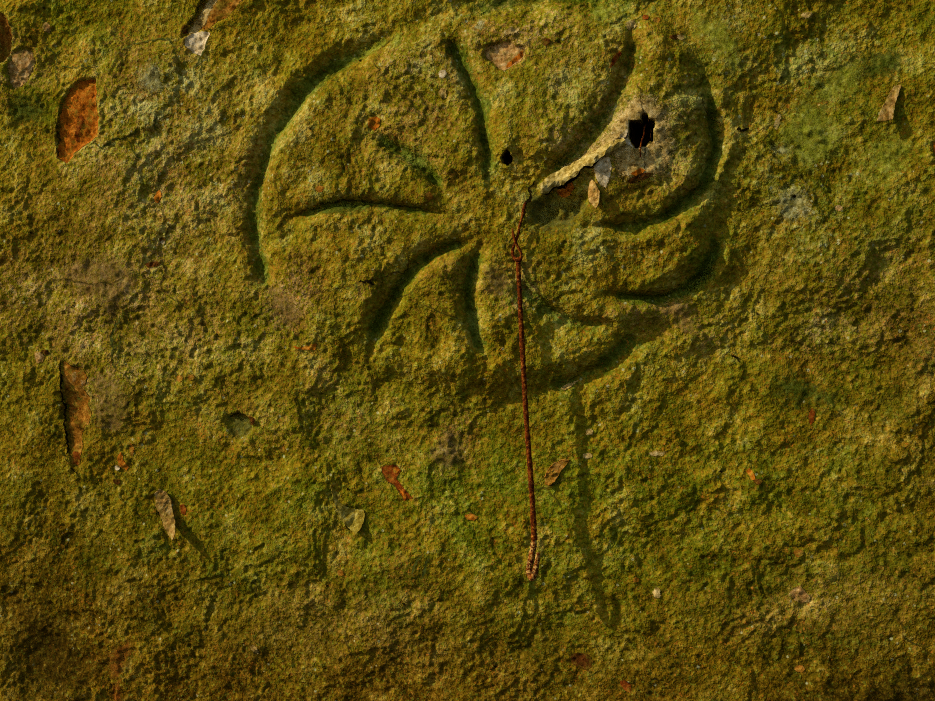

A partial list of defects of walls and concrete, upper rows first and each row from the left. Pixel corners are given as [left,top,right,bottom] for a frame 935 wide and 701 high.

flaking render [179,0,243,55]
flaking render [485,26,525,71]
flaking render [56,79,99,163]
flaking render [539,91,677,209]
crack [616,82,698,169]
crack [702,97,749,132]
crack [95,115,219,309]
crack [523,159,599,218]
crack [42,270,133,285]
flaking render [63,362,92,466]
flaking render [378,462,412,501]